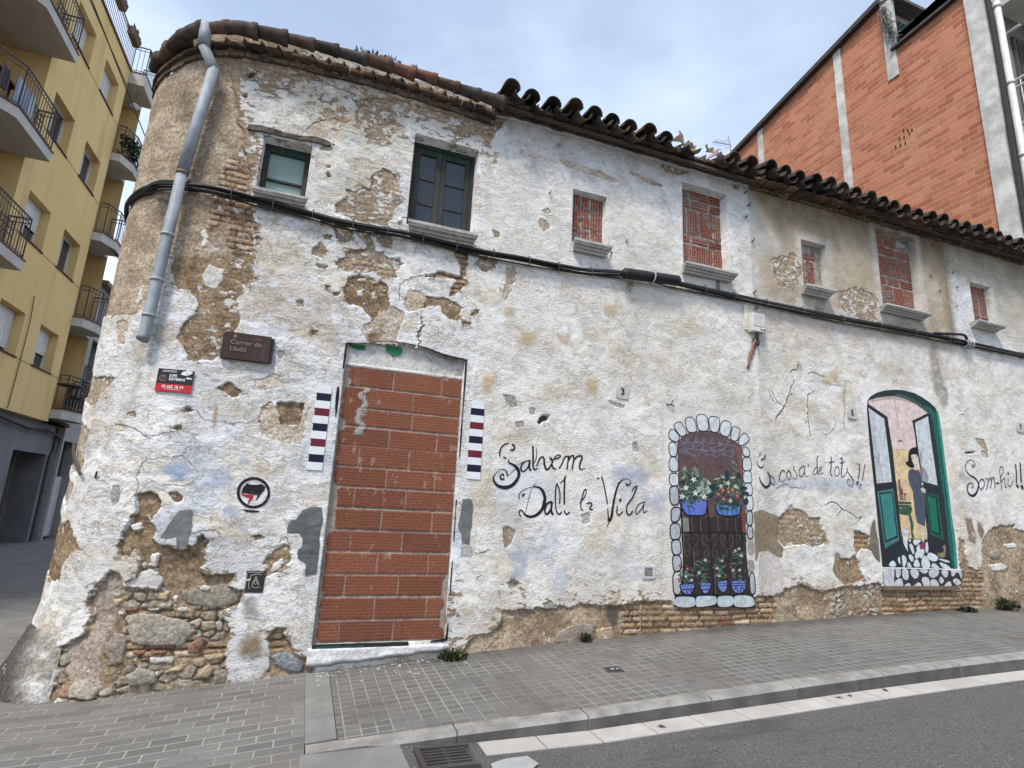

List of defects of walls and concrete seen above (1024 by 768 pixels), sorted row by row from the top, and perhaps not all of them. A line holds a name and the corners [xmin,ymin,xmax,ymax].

flaking render [106,50,260,361]
flaking render [312,169,493,346]
flaking render [772,253,802,290]
flaking render [836,287,879,322]
crack [768,363,846,435]
flaking render [260,402,310,445]
flaking render [111,486,121,506]
flaking render [777,505,827,547]
flaking render [48,520,81,581]
flaking render [263,544,291,577]
flaking render [463,525,1024,654]